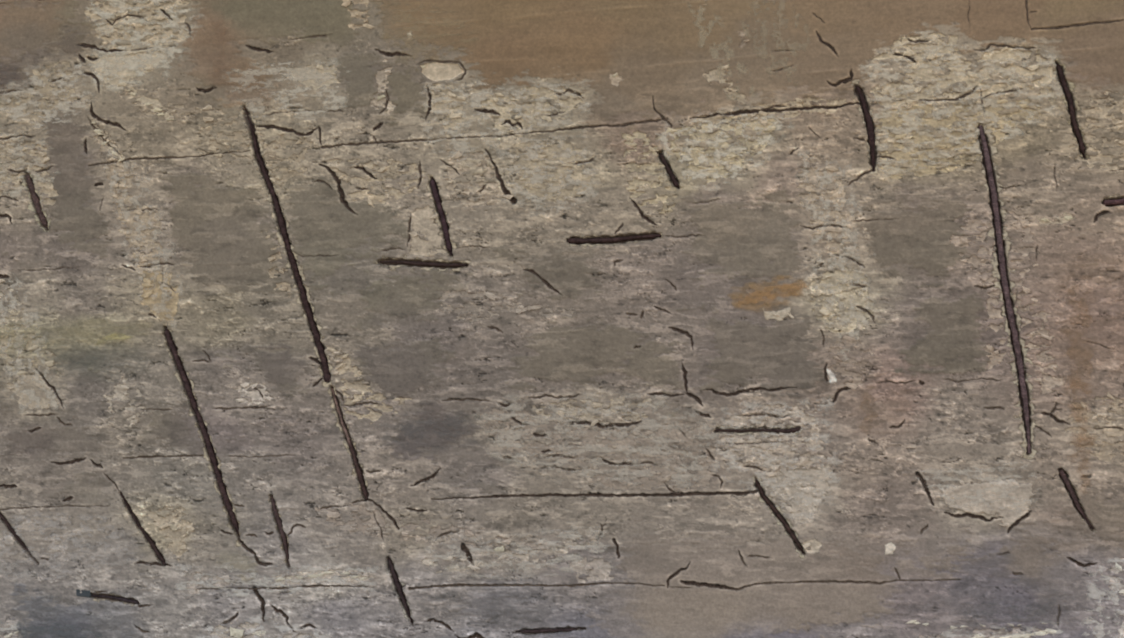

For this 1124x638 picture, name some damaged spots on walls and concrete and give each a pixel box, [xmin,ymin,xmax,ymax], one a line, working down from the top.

crack [51,9,859,215]
spalling [610,72,623,87]
spalling [84,0,614,594]
spalling [568,230,662,247]
peeling [621,32,1124,460]
crack [196,279,960,633]
crack [425,618,485,638]